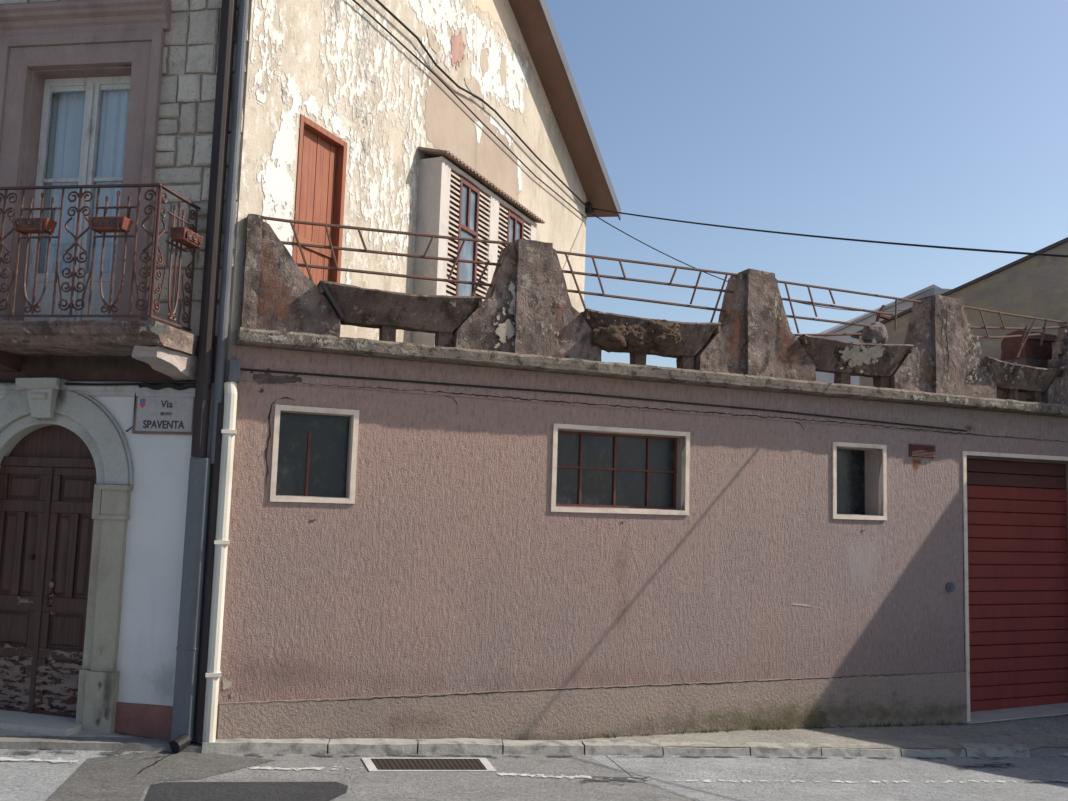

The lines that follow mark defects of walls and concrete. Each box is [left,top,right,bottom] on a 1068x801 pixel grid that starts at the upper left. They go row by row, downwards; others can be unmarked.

peeling [249,0,529,285]
spalling [494,281,516,348]
spalling [839,337,885,373]
peeling [0,643,83,715]